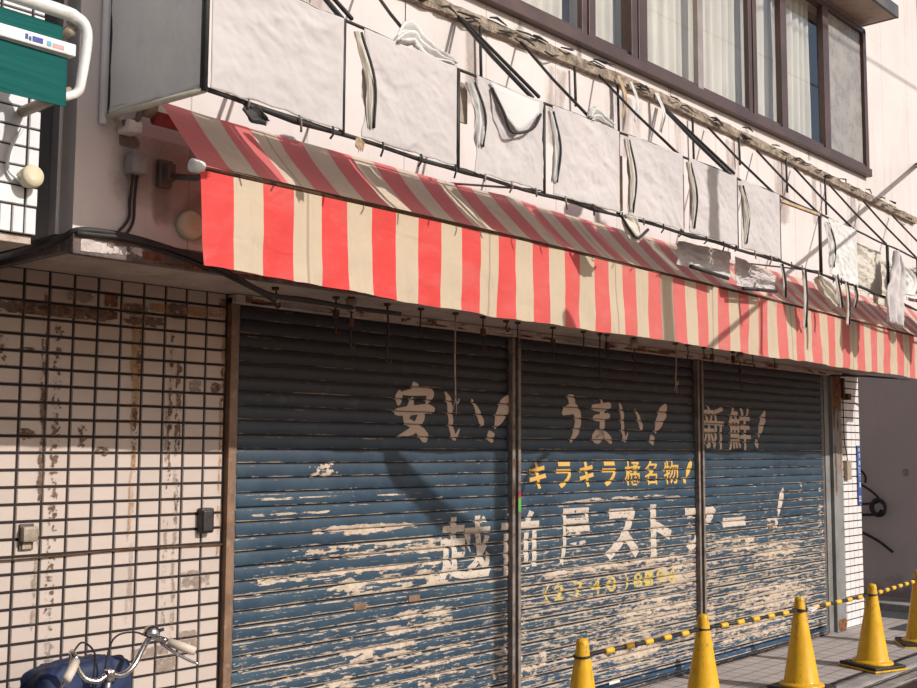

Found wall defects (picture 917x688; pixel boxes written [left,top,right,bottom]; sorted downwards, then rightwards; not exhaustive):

peeling [80,239,163,261]
peeling [309,462,342,477]
peeling [562,494,679,504]
peeling [250,522,453,598]
peeling [708,535,804,563]
peeling [521,515,695,688]
peeling [707,577,818,645]
peeling [286,606,475,688]